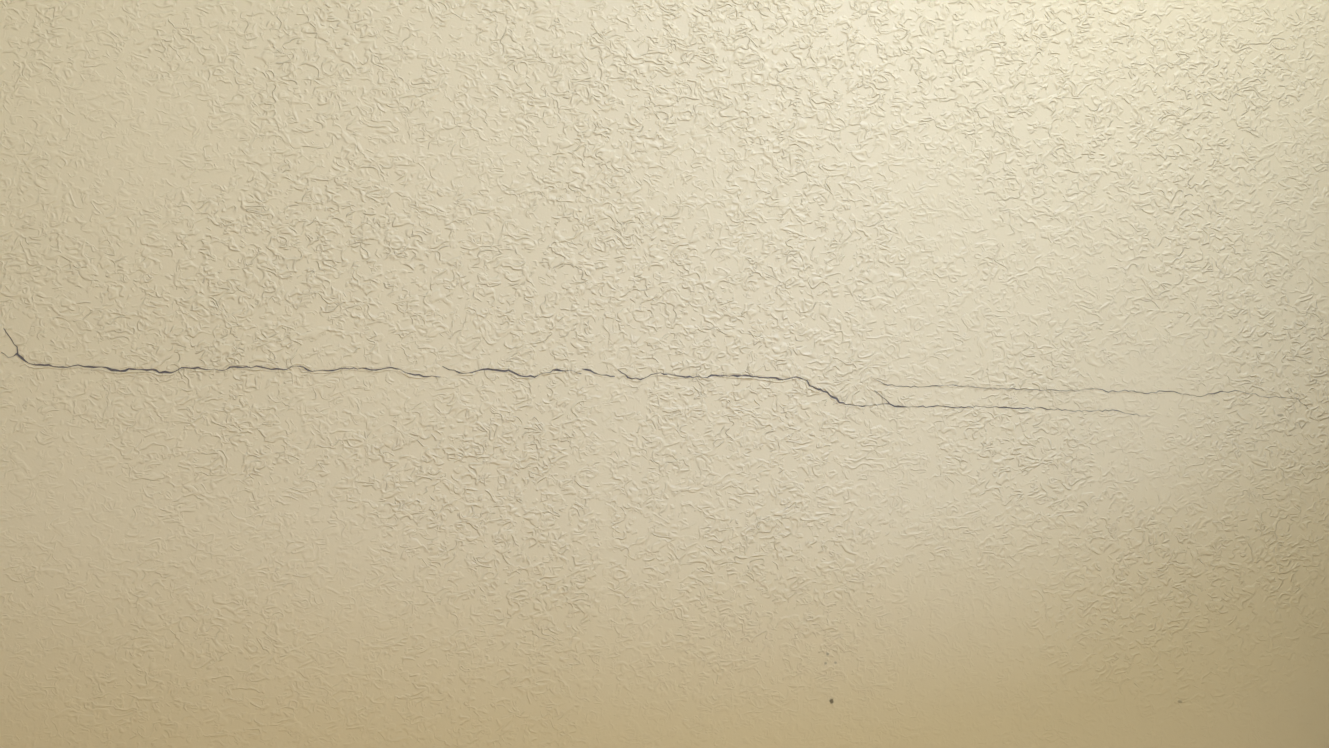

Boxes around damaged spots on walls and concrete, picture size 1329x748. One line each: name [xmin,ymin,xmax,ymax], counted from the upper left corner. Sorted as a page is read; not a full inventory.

crack [1,329,1307,415]